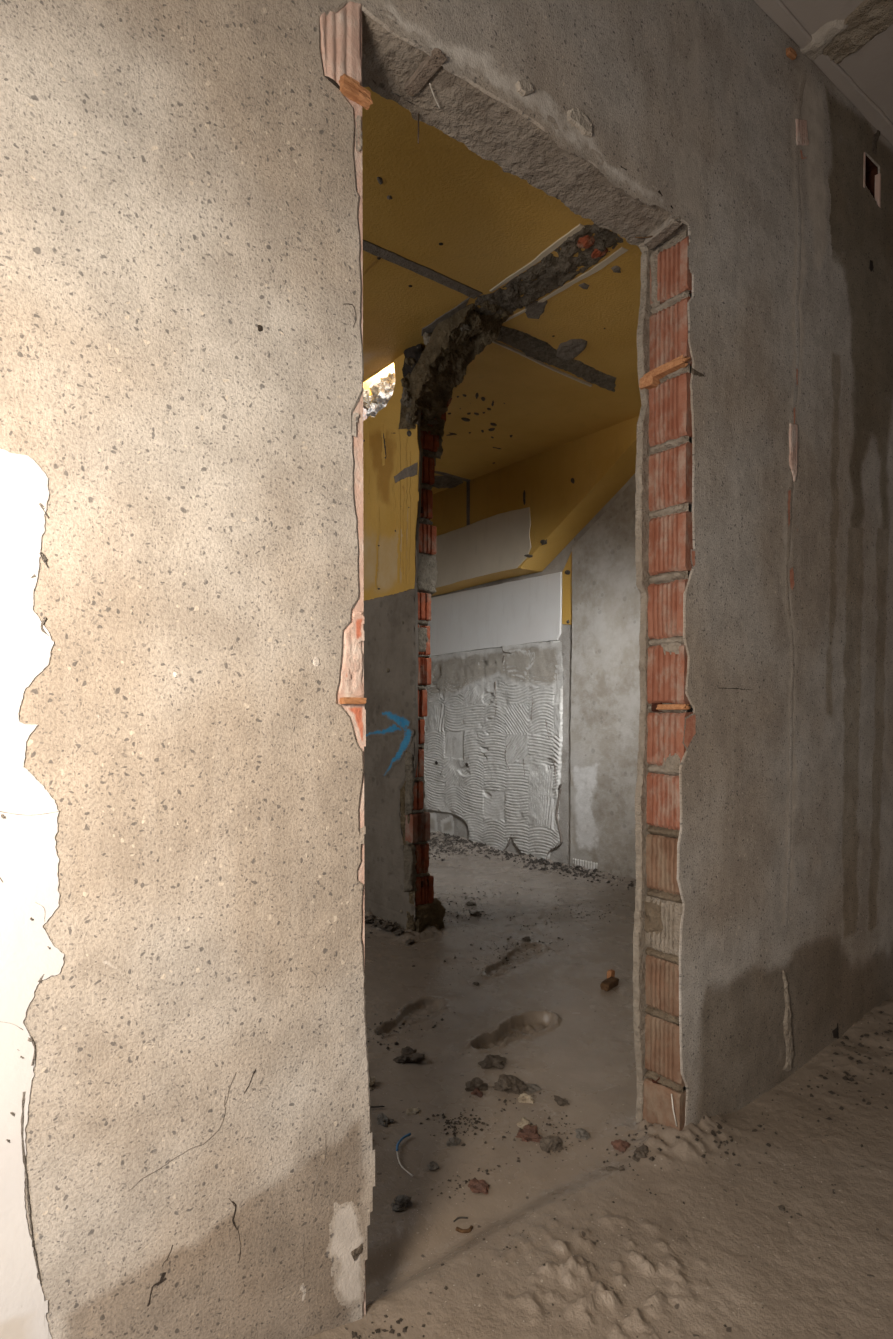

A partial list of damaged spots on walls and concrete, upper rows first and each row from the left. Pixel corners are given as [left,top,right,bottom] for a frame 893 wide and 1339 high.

peeling [0,448,65,1339]
spalling [351,1243,362,1261]
water stain [685,66,893,1126]